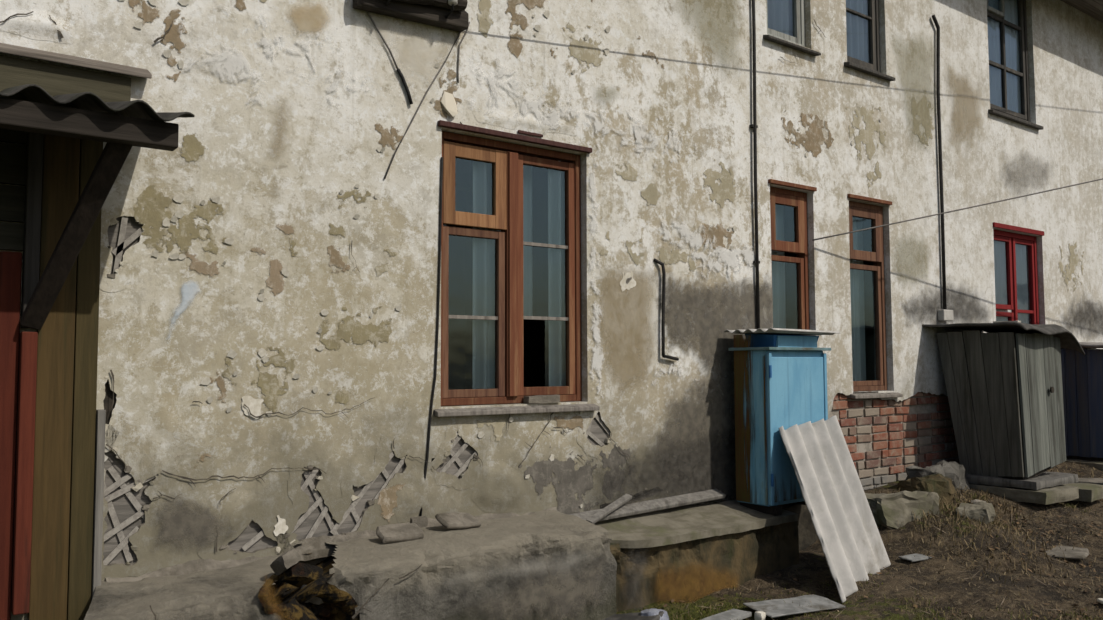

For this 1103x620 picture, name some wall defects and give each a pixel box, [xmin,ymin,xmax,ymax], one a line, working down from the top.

peeling [119,0,190,82]
peeling [505,0,550,58]
water stain [471,60,683,162]
peeling [781,110,834,158]
spalling [100,185,234,293]
water stain [589,162,599,232]
spalling [96,354,180,581]
crack [153,467,327,552]
crack [244,398,373,418]
spalling [198,417,514,620]
water stain [588,216,773,504]
spalling [827,375,960,490]